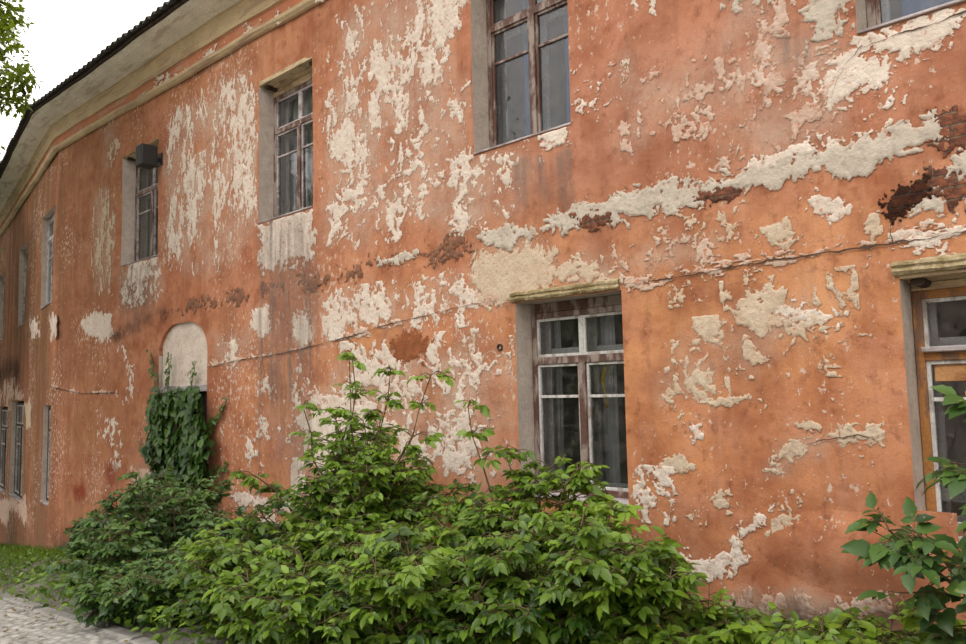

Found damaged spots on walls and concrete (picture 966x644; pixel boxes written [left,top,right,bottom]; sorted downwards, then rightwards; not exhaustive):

crack [831,10,966,97]
flaking render [81,0,966,524]
crack [621,224,966,292]
crack [206,291,500,381]
flaking render [633,444,893,631]